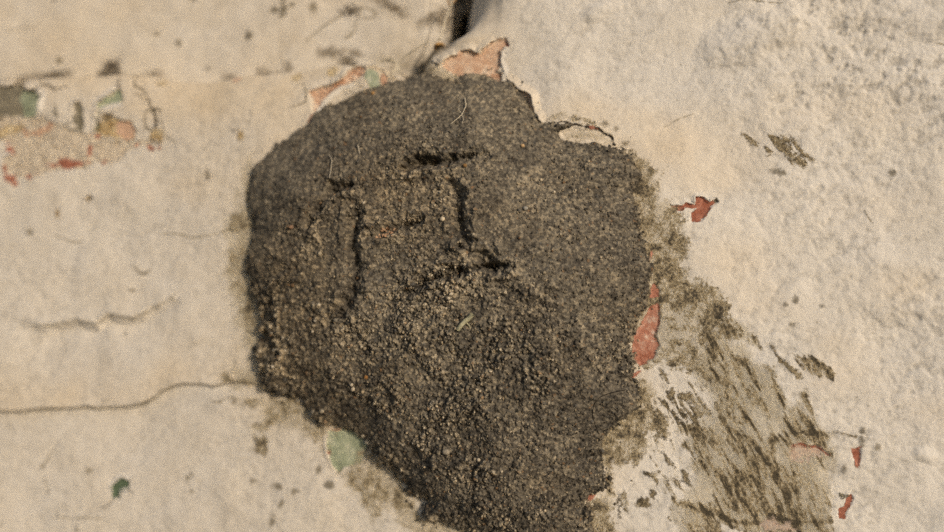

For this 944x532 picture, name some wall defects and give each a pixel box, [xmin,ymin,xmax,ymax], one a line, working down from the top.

peeling [0,78,164,186]
peeling [308,65,403,123]
peeling [432,35,547,123]
peeling [671,192,719,222]
peeling [632,284,660,377]
leakage [588,150,857,532]
peeling [103,473,130,508]